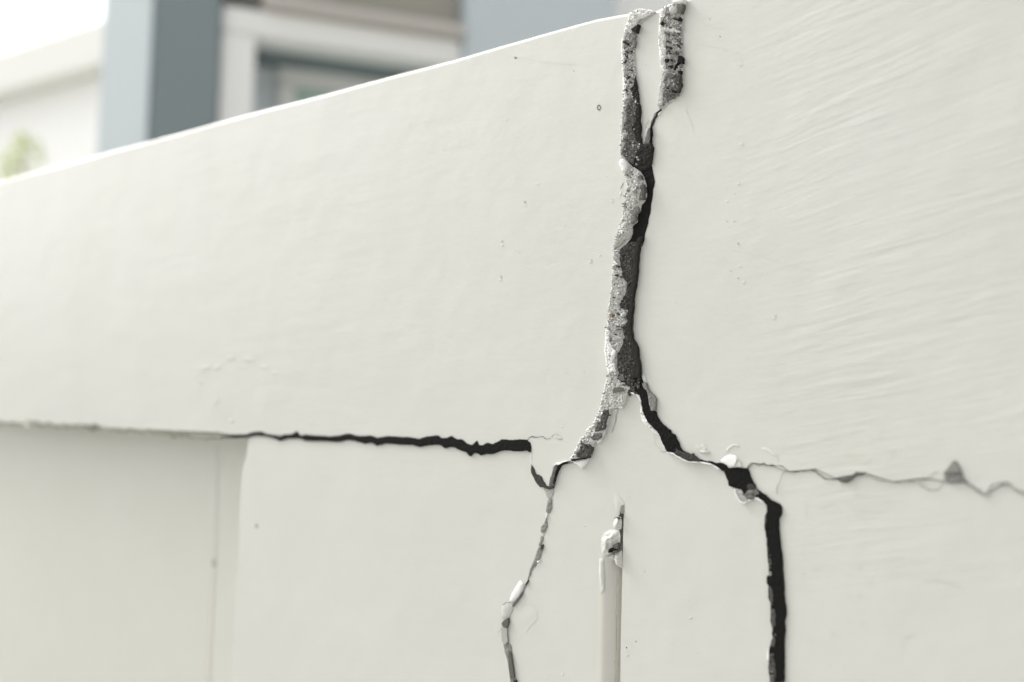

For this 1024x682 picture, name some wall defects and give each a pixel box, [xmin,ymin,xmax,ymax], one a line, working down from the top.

crack [0,420,570,682]
spalling [553,0,742,470]
crack [611,76,837,682]
crack [864,472,1024,496]